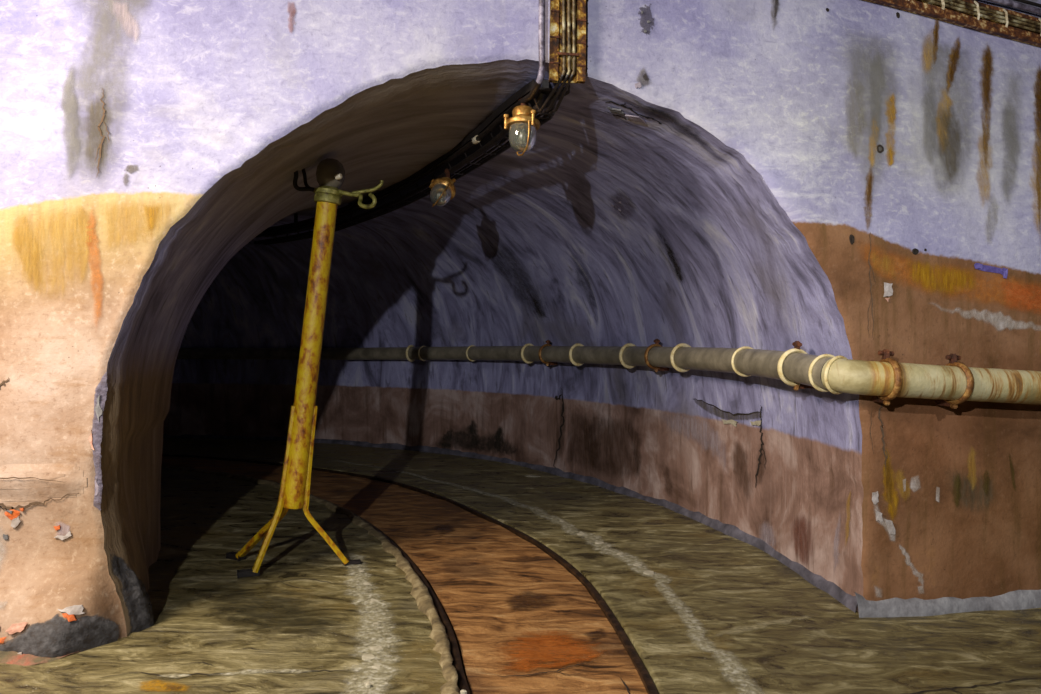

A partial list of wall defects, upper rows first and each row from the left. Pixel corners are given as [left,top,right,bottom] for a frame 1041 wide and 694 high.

leakage [62,0,143,172]
leakage [857,61,895,165]
corrosion [924,19,939,68]
corrosion [937,39,960,146]
corrosion [980,49,993,192]
corrosion [1033,70,1041,223]
leakage [15,215,101,316]
spalling [3,508,24,540]
crack [0,477,79,516]
peeling [54,525,72,540]
spalling [0,554,154,658]